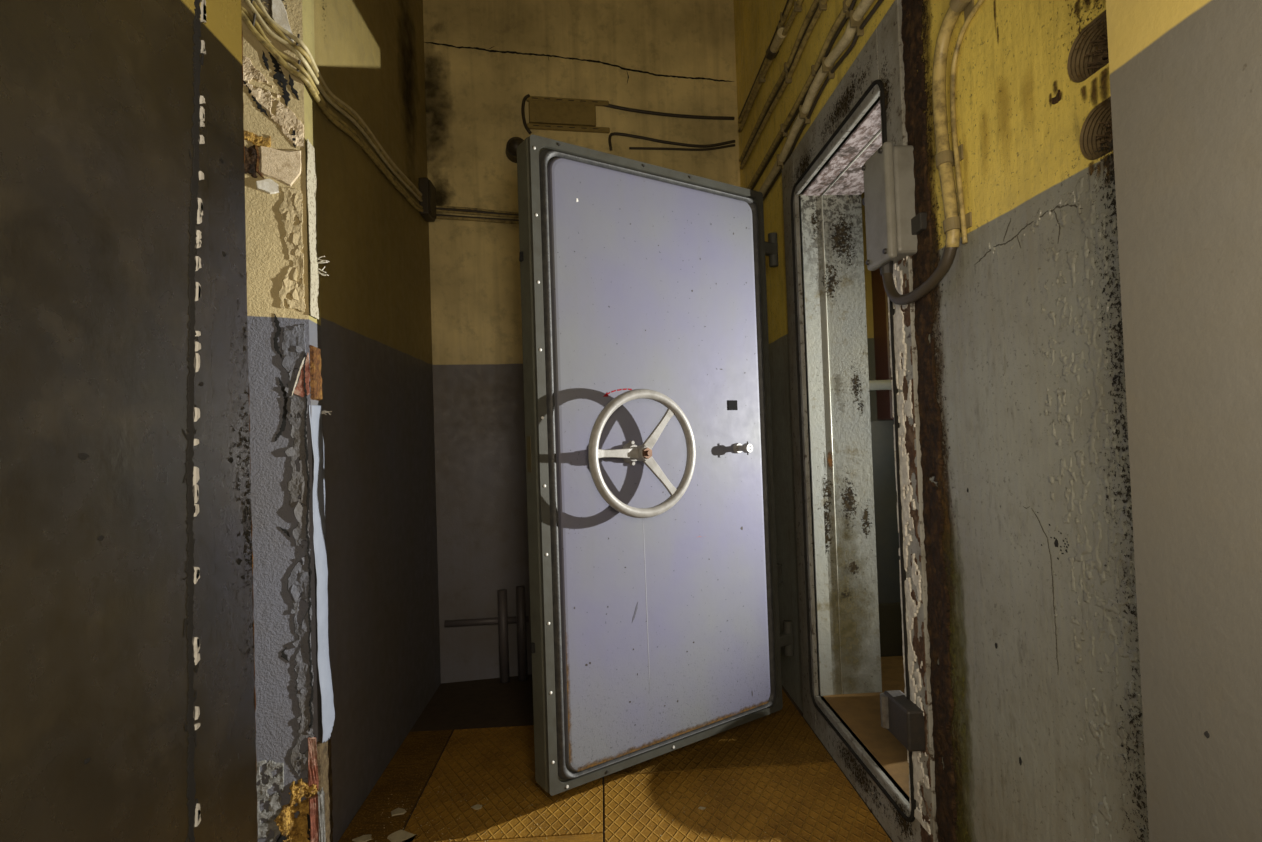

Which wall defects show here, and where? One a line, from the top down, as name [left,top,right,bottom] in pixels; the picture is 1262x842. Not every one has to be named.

crack [425,42,734,83]
damp [1043,0,1110,99]
crack [976,191,1083,264]
crack [183,0,314,842]
peeling [243,50,335,842]
rust [309,345,323,401]
rust [788,0,969,842]